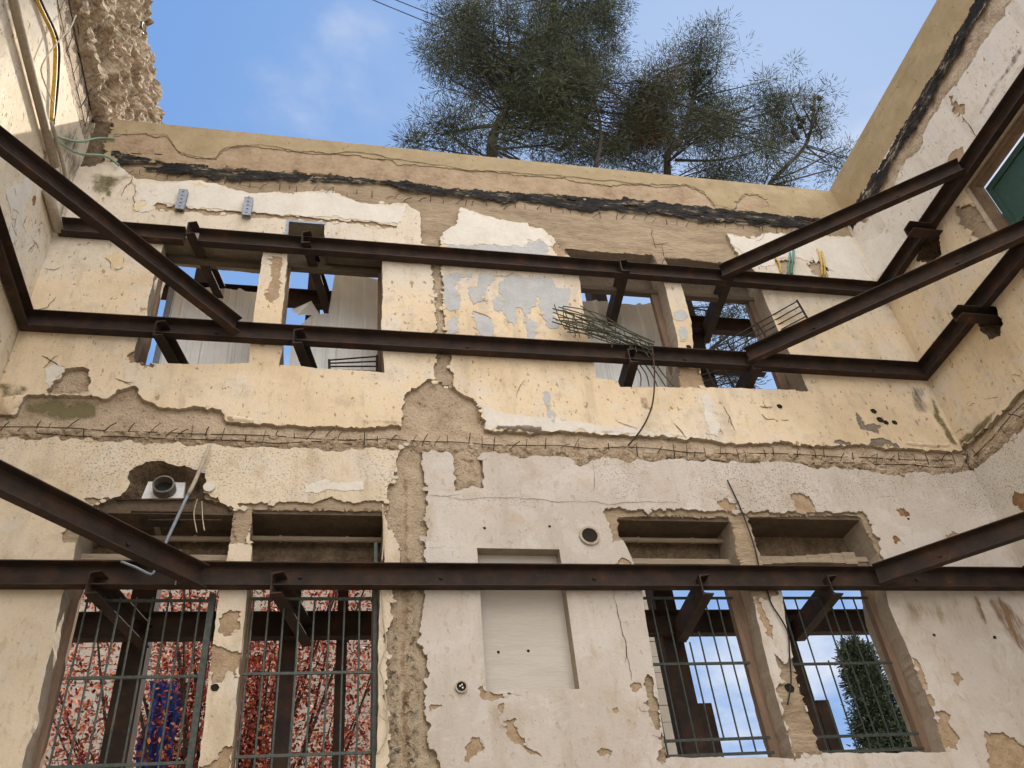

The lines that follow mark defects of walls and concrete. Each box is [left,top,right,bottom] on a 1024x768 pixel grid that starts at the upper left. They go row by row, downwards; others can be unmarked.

peeling [57,0,715,229]
crack [122,132,763,210]
peeling [439,208,569,257]
spalling [264,254,283,303]
peeling [429,264,571,339]
leakage [28,401,95,419]
spalling [678,367,721,438]
spalling [0,391,1024,562]
spalling [380,590,442,768]
spalling [479,686,540,756]
spalling [630,676,671,768]
spalling [984,732,1024,768]